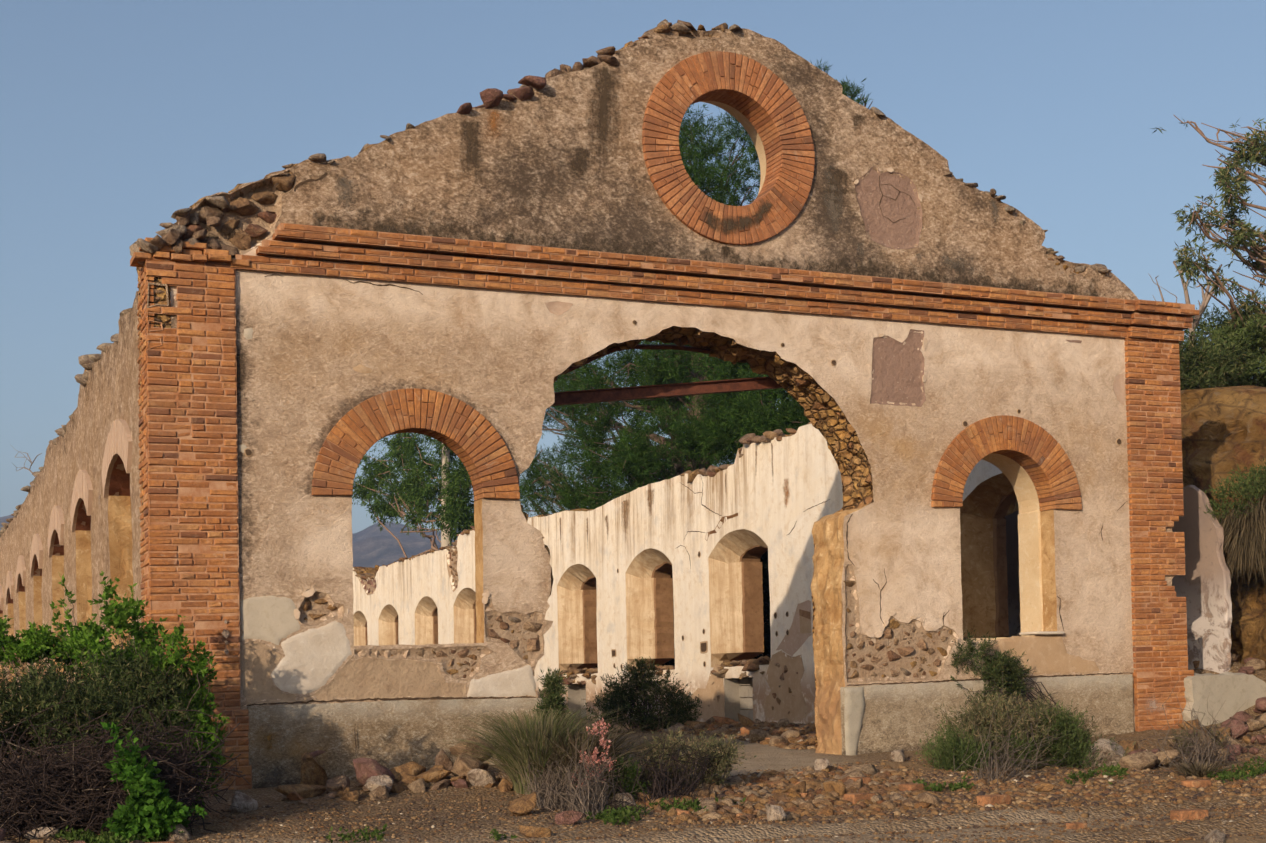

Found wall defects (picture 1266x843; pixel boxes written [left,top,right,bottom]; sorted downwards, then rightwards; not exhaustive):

water stain [461,121,482,178]
water stain [571,66,618,175]
crack [879,176,915,223]
water stain [312,201,1099,297]
peeling [870,329,928,407]
crack [675,478,738,568]
spalling [294,588,344,625]
peeling [240,641,480,703]
peeling [764,600,812,722]